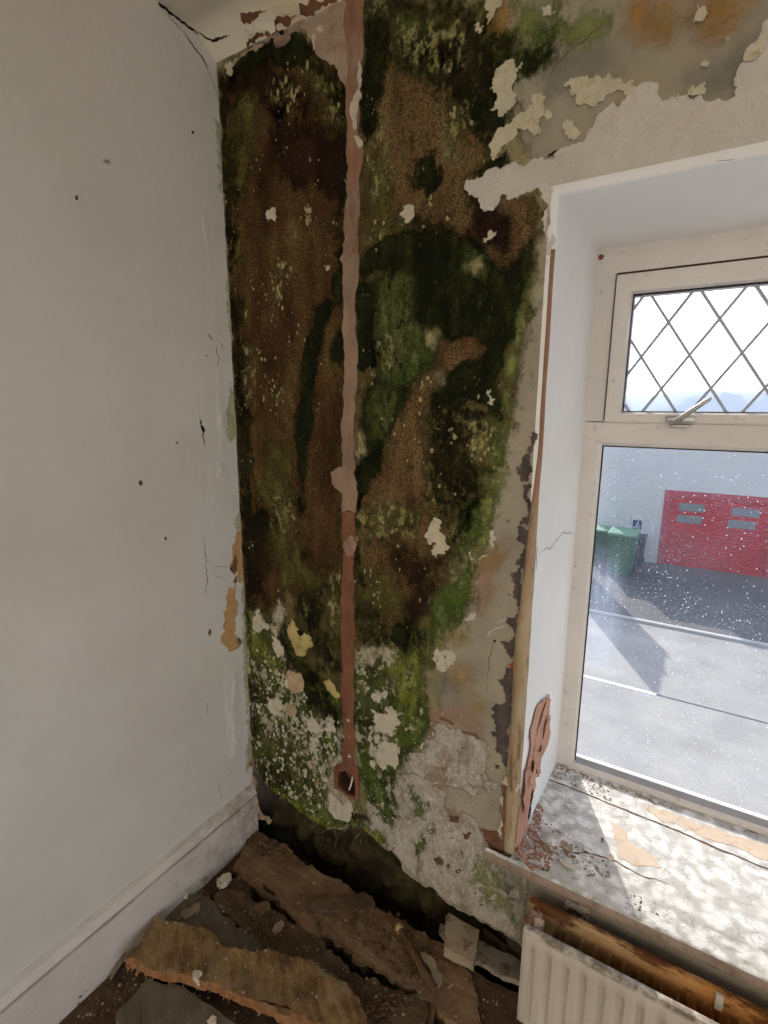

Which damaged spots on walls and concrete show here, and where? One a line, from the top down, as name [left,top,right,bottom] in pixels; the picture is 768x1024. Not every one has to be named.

crack [158,2,228,102]
flaking render [224,0,363,148]
peeling [474,0,502,34]
peeling [464,19,768,256]
peeling [693,3,708,23]
damp [216,0,546,825]
flaking render [220,432,538,941]